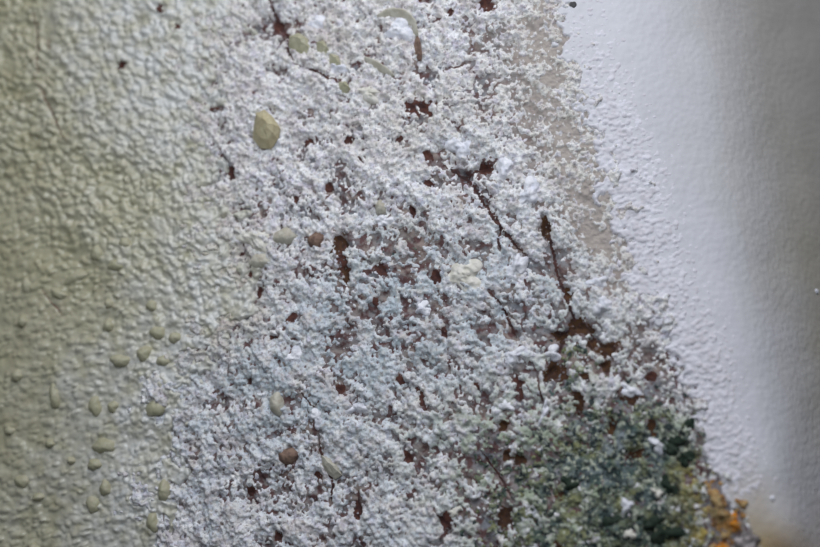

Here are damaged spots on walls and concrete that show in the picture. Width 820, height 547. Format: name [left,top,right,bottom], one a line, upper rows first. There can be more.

water stain [118,464,158,511]
water stain [139,0,781,547]
flaking render [170,0,762,547]
rust [704,479,748,547]